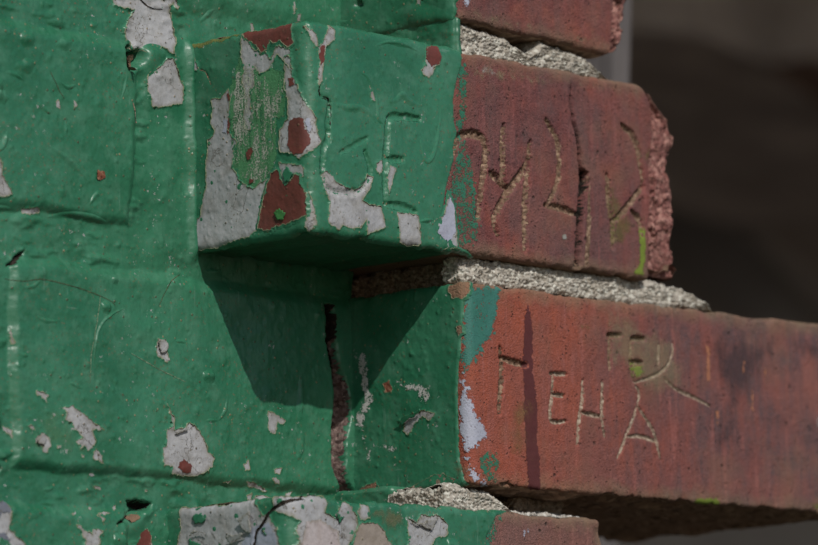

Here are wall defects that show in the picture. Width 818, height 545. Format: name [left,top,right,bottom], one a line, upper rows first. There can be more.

peeling [111,0,186,111]
peeling [420,44,442,80]
peeling [197,0,422,254]
peeling [0,156,14,200]
peeling [433,192,459,250]
peeling [34,388,50,405]
peeling [59,403,106,493]
peeling [160,401,216,480]
crack [253,497,303,545]
peeling [176,457,396,545]
peeling [405,511,449,545]